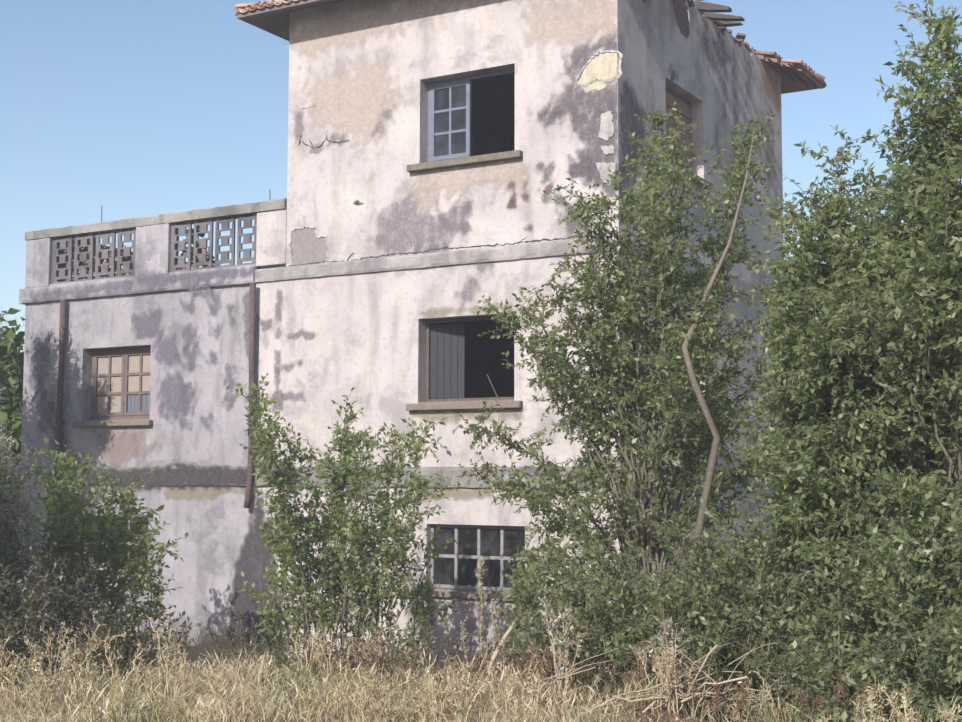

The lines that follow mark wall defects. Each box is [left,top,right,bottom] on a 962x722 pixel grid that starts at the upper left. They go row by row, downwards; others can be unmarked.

leakage [291,0,488,55]
crack [298,134,350,148]
leakage [305,63,395,144]
leakage [526,0,645,196]
peeling [575,49,623,93]
leakage [376,163,527,256]
leakage [30,254,254,358]
leakage [261,291,314,339]
leakage [132,309,198,428]
leakage [272,351,303,411]
leakage [98,430,264,489]
leakage [227,499,284,650]